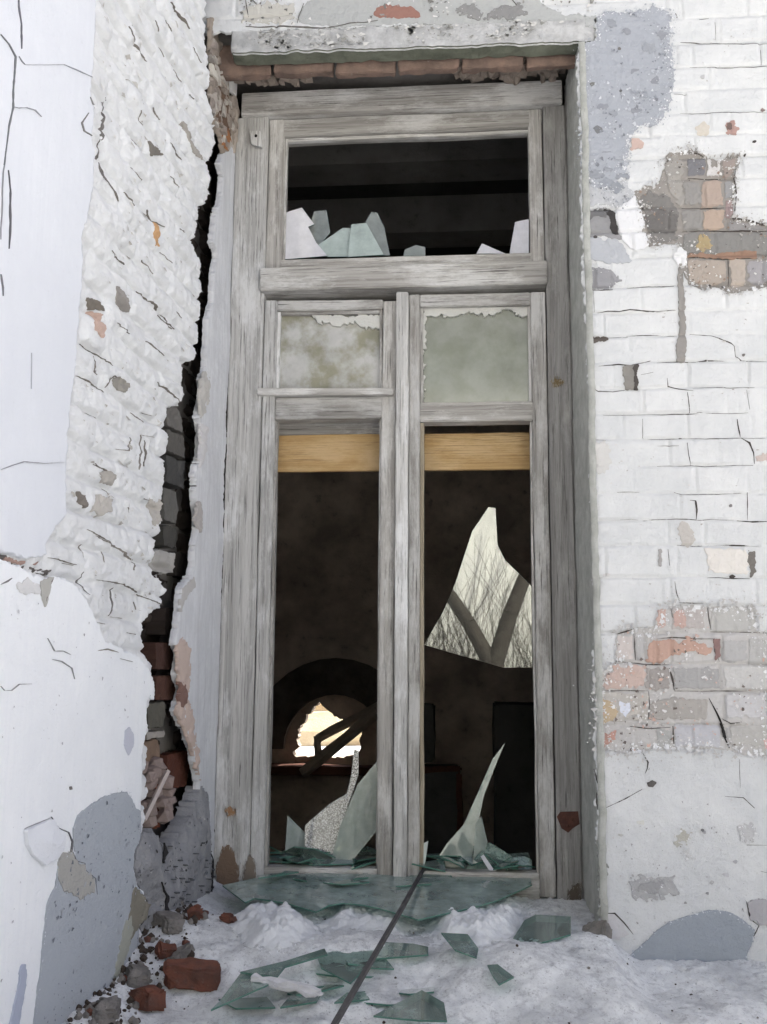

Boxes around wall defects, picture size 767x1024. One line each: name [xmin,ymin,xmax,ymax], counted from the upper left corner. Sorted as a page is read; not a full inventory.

crack [0,0,117,249]
peeling [298,0,767,293]
crack [221,395,229,531]
crack [596,334,765,467]
flaking render [596,605,767,757]
spalling [138,806,216,907]
crack [209,829,217,892]